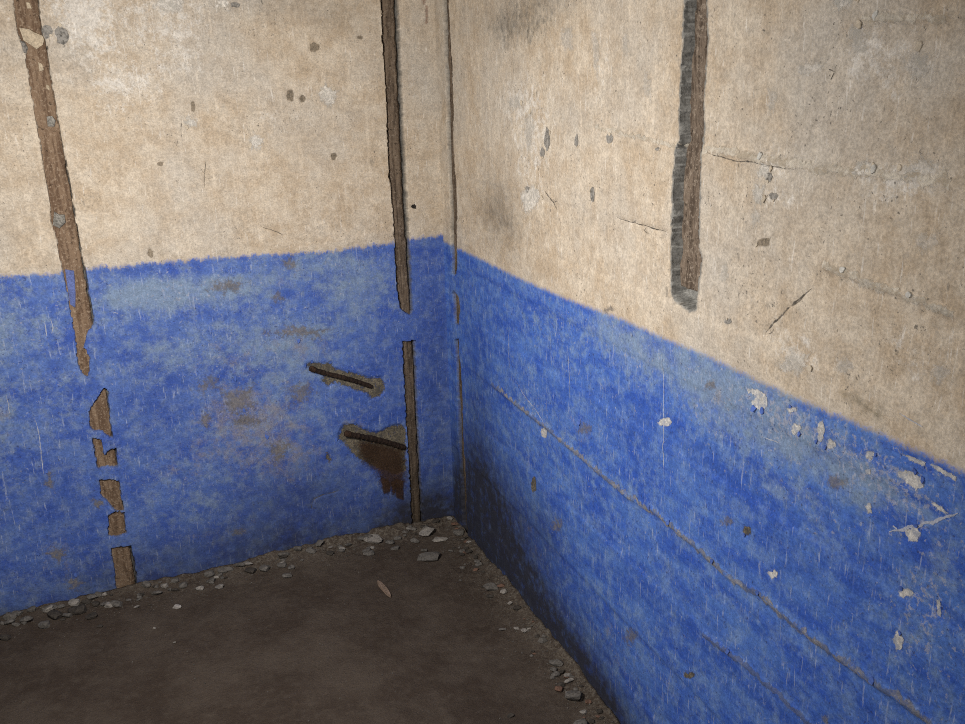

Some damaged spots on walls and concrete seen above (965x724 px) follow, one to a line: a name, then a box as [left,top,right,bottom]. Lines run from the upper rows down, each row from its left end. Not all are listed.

peeling [748,388,767,415]
peeling [787,404,801,437]
peeling [814,420,836,450]
corrosion [360,441,406,500]
peeling [898,455,956,491]
peeling [905,524,921,542]
peeling [899,586,913,598]
peeling [893,630,904,650]